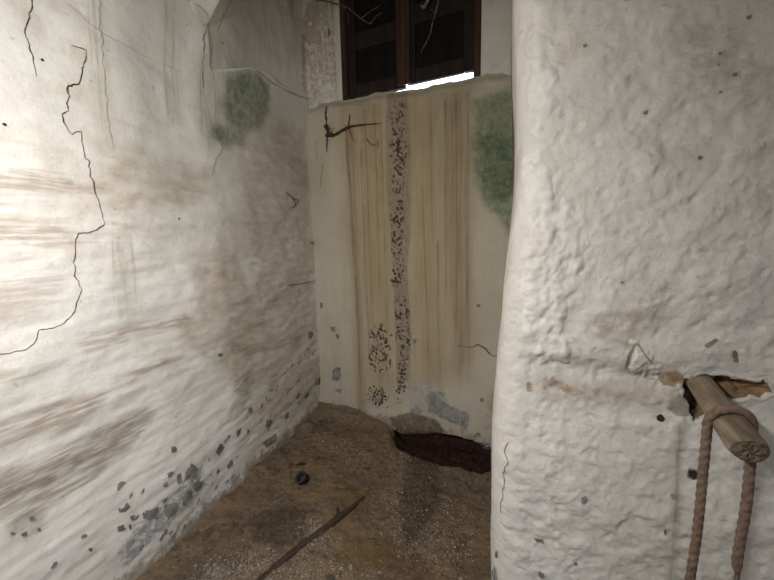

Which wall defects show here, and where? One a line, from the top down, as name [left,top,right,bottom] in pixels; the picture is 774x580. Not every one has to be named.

crack [188,0,233,174]
crack [5,0,181,354]
leakage [369,103,411,404]
spalling [208,332,320,462]
leakage [368,386,388,408]
spalling [624,338,774,426]
spalling [117,455,238,565]